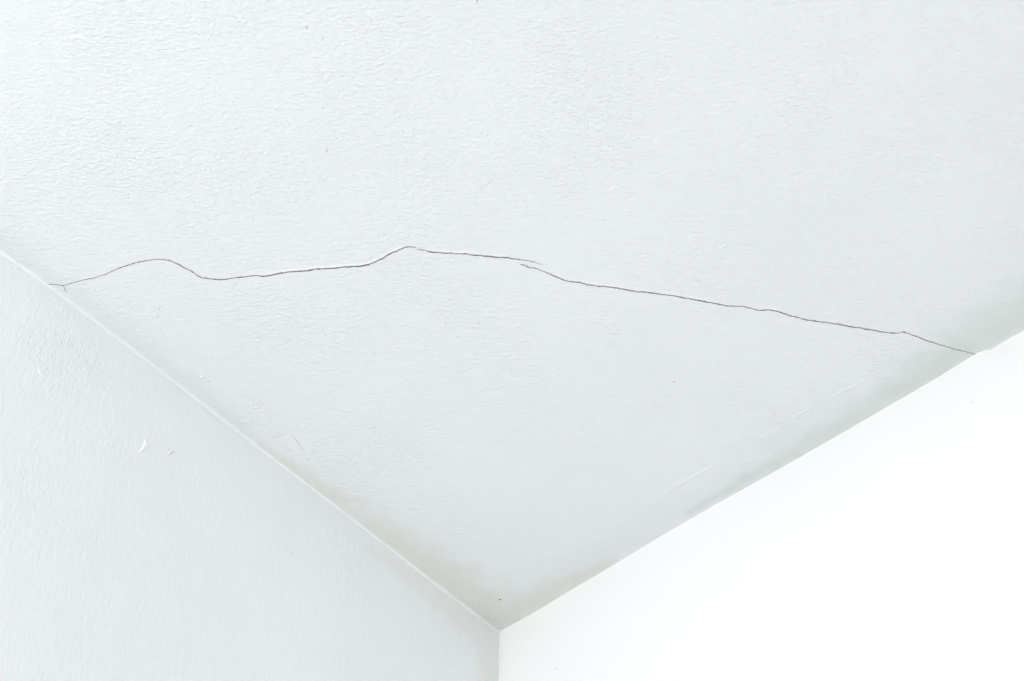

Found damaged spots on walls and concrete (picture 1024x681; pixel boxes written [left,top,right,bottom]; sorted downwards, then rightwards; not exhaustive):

crack [49,246,974,354]